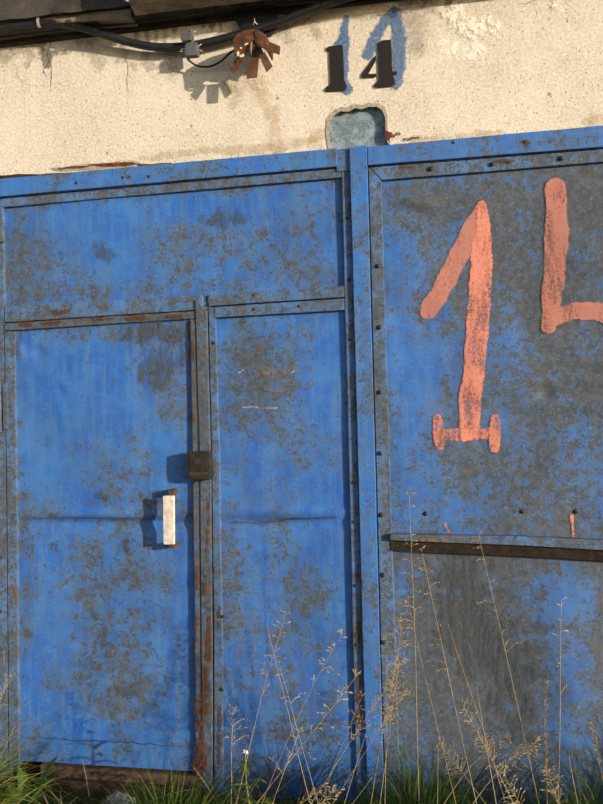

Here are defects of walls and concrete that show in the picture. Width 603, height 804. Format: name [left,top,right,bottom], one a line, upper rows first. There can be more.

crack [11,42,75,93]
corrosion [192,606,222,773]